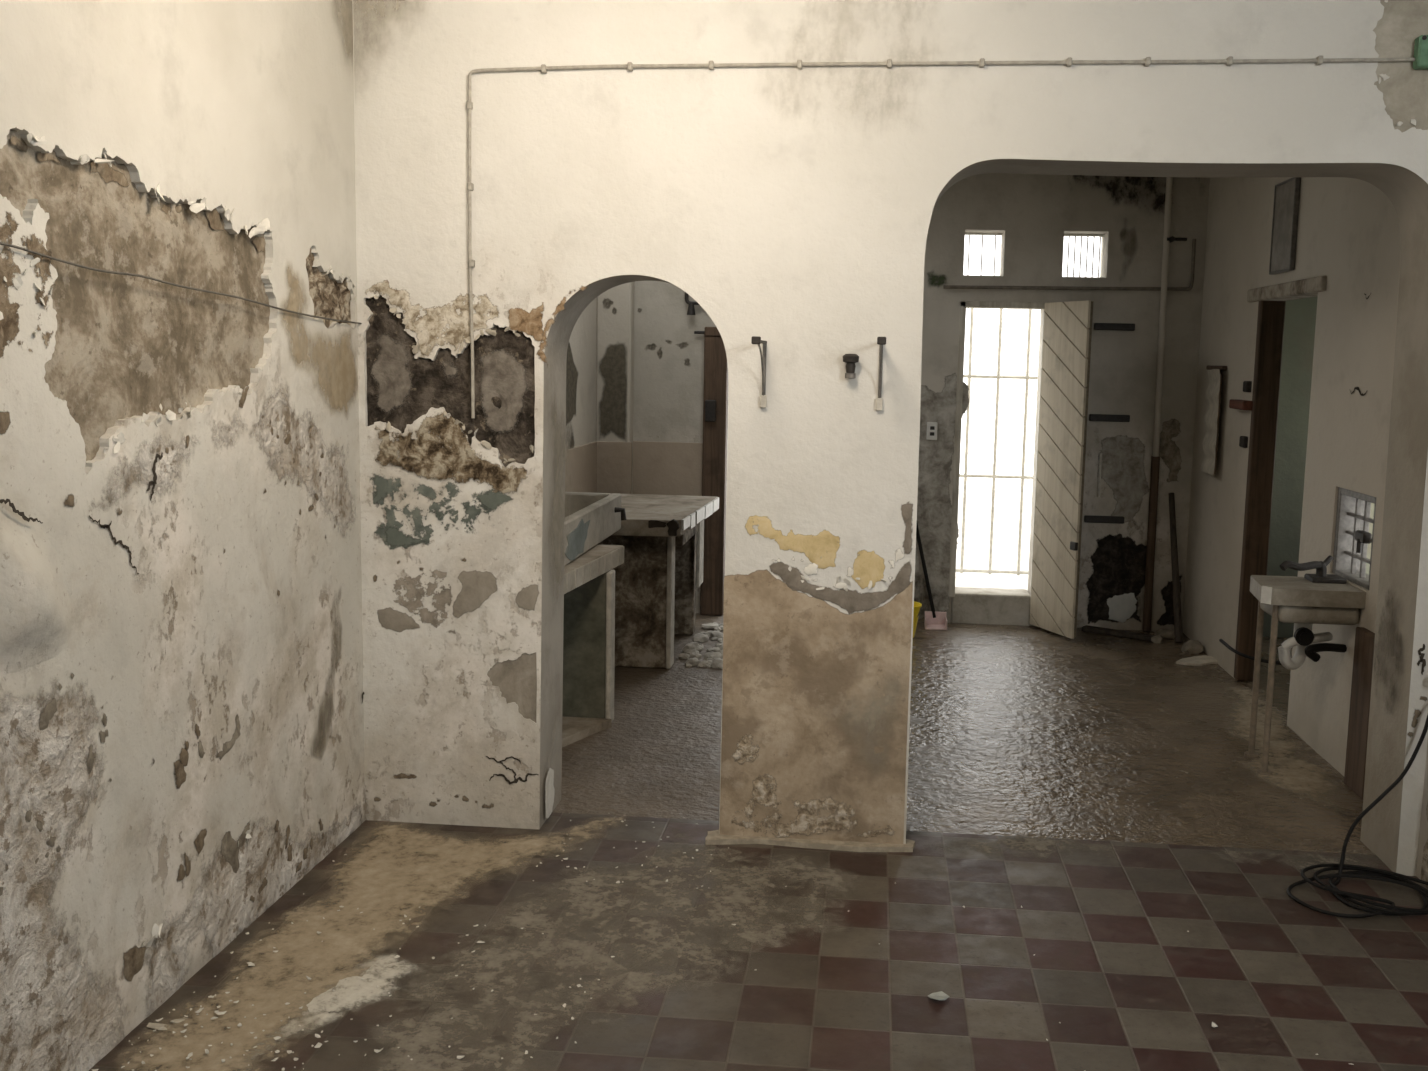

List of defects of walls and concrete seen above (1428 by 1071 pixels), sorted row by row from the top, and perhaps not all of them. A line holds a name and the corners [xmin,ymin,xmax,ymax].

water stain [338,0,401,55]
spalling [1373,0,1428,132]
water stain [1074,175,1166,212]
spalling [0,130,354,538]
spalling [306,248,587,634]
crack [89,515,139,575]
spalling [719,373,969,844]
spalling [1086,419,1182,626]
spalling [487,652,537,723]
crack [486,756,539,784]
peeling [1408,696,1427,737]
peeling [0,673,381,1071]